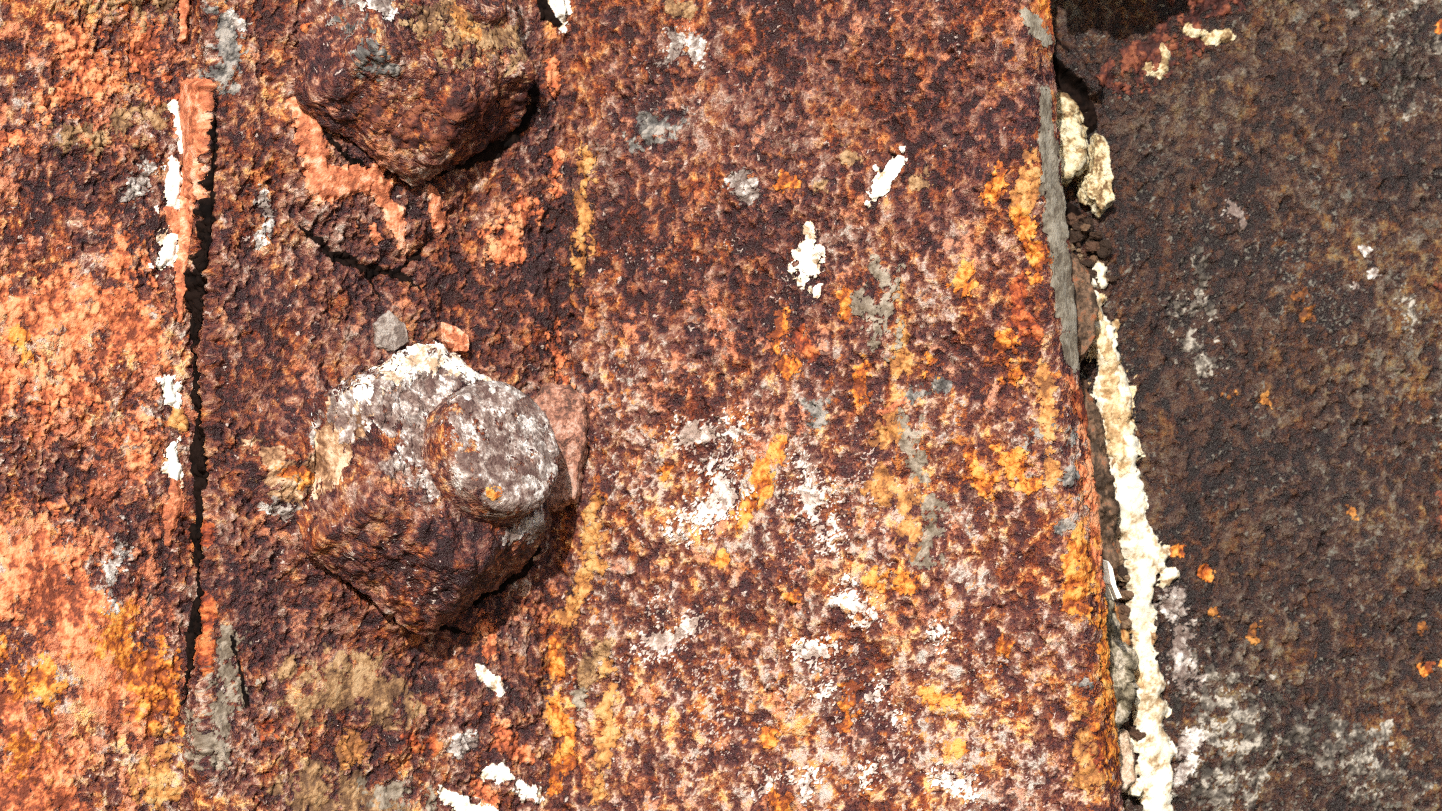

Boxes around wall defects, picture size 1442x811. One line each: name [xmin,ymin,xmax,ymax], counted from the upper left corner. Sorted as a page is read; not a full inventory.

leakage [326,0,400,97]
rust [351,0,563,158]
rust [1095,0,1246,103]
rust [0,0,217,485]
rust [284,96,408,254]
rust [474,141,598,291]
rust [240,371,374,522]
rust [441,322,469,353]
rust [956,146,1122,795]
leakage [1086,293,1146,497]
rust [446,317,623,808]
rust [0,501,186,811]